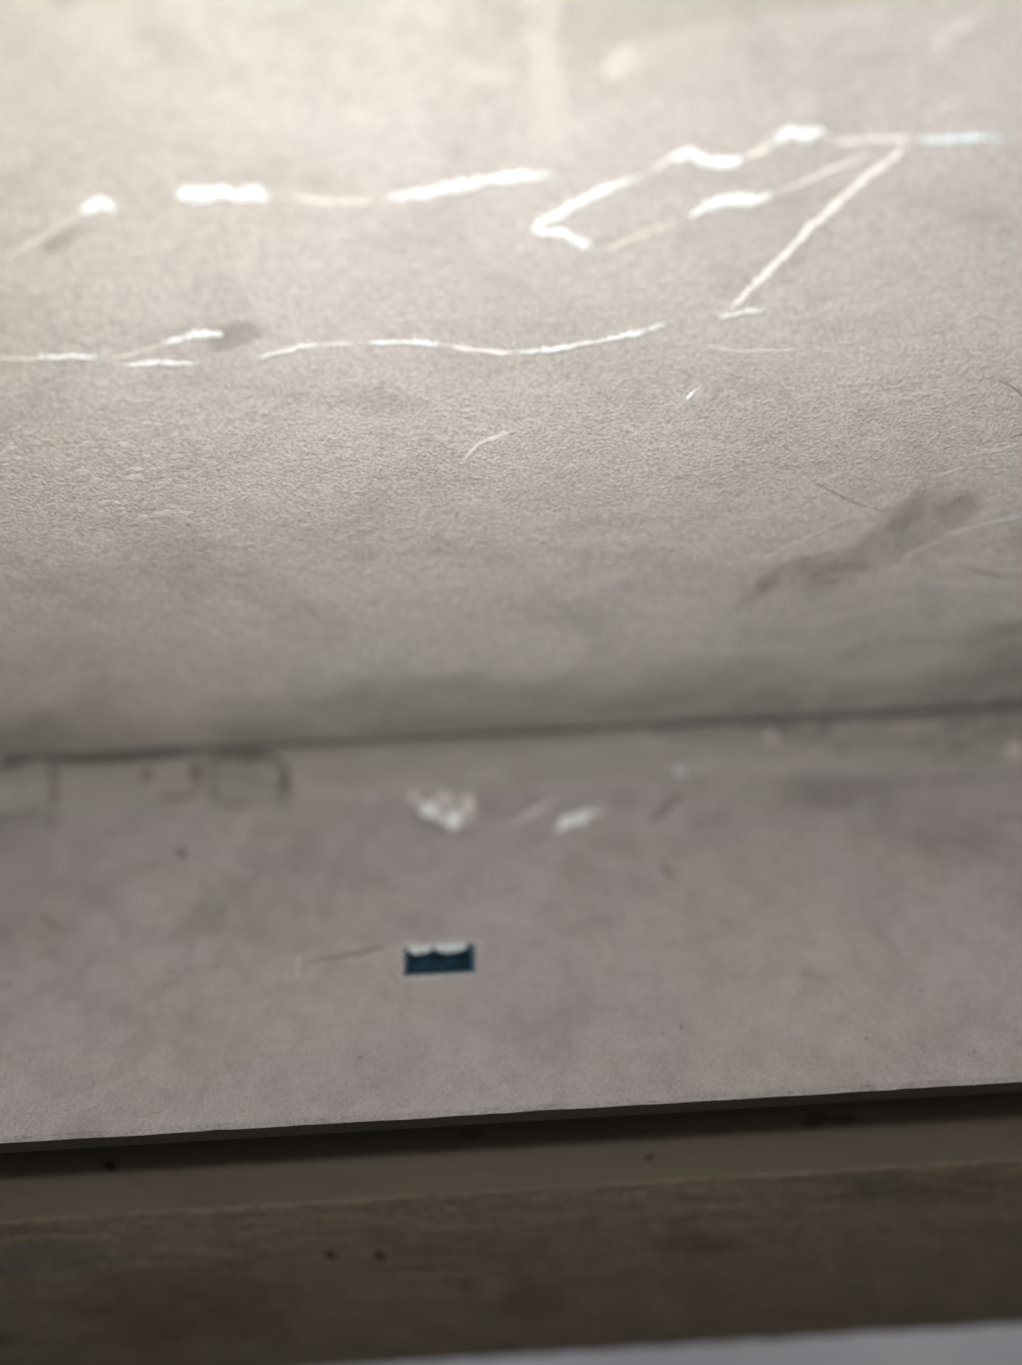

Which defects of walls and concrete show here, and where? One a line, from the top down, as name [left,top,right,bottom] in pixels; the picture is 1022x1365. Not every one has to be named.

crack [3,195,116,259]
crack [173,125,1005,319]
crack [0,329,224,369]
crack [257,322,667,360]